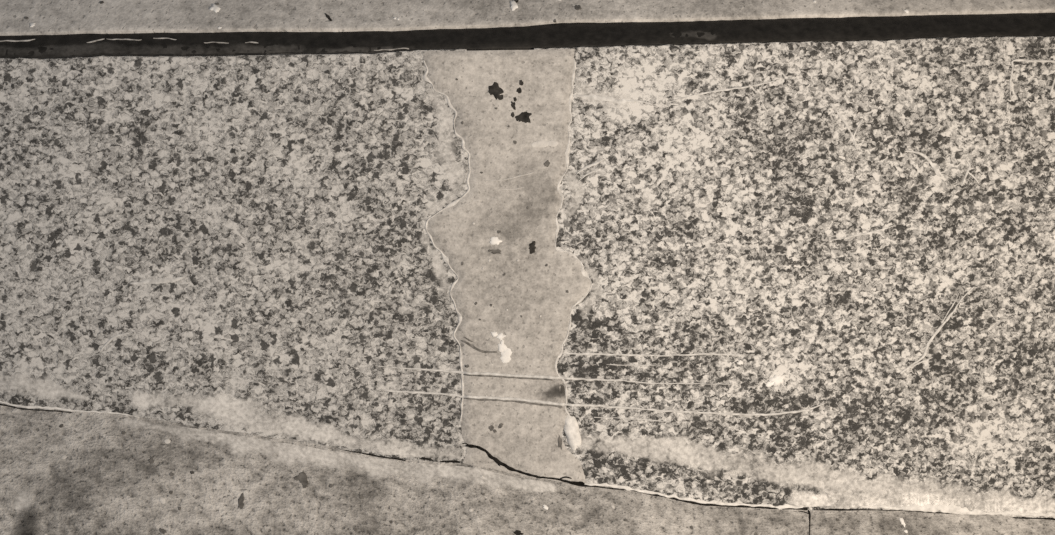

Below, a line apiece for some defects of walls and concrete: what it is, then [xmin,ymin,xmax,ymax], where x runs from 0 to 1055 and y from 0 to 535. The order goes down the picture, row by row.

spalling [488,80,532,128]
peeling [482,230,502,270]
crack [0,404,72,413]
spalling [558,415,581,451]
crack [335,443,950,535]
crack [1013,514,1055,522]